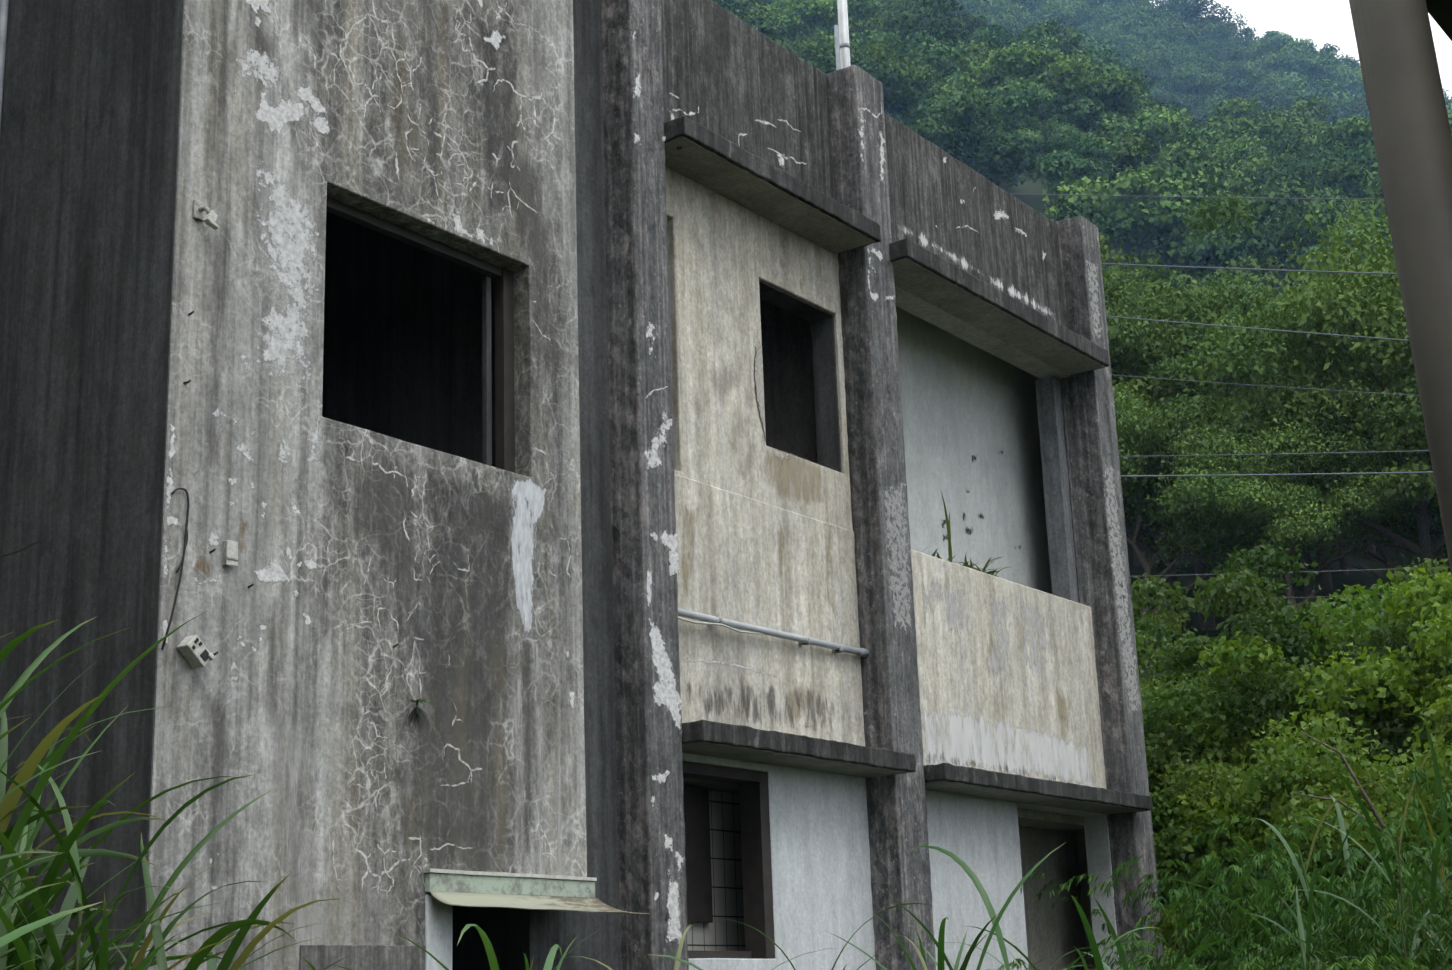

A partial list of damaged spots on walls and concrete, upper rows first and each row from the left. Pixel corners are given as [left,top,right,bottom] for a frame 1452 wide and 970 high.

peeling [246,0,271,27]
peeling [228,48,330,134]
crack [270,0,562,217]
peeling [241,163,319,395]
peeling [511,479,547,633]
crack [549,532,572,582]
crack [340,451,482,787]
peeling [646,530,683,732]
damp [689,683,832,728]
damp [1057,693,1066,718]
crack [357,722,387,808]
crack [332,837,471,896]